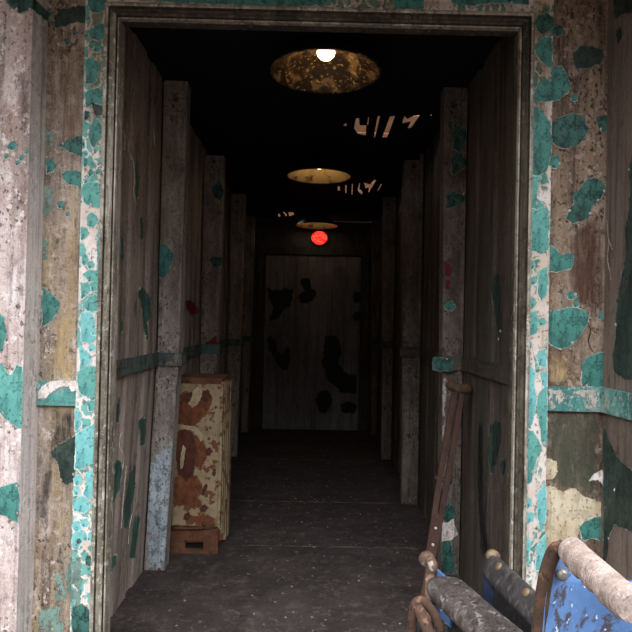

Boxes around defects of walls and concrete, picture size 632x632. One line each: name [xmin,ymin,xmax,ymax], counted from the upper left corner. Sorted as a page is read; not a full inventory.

peeling [0,364,28,428]
peeling [4,0,106,632]
peeling [526,12,632,571]